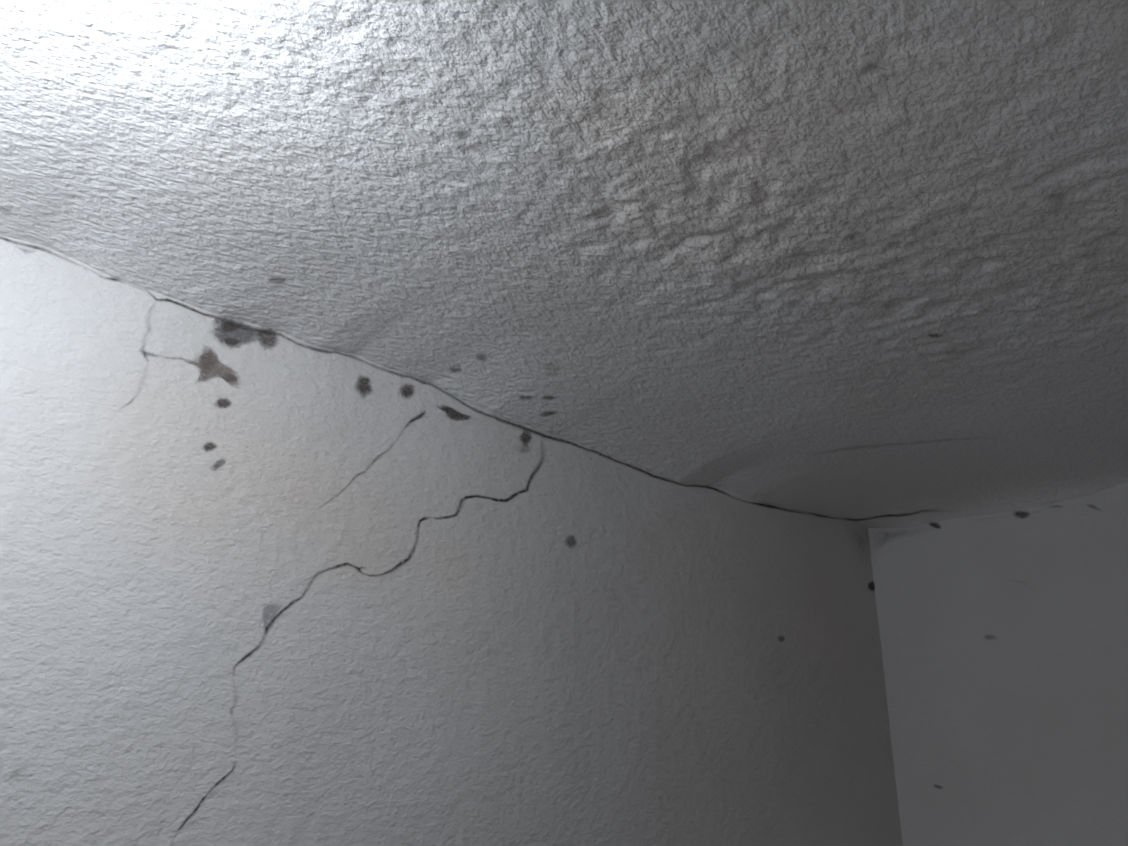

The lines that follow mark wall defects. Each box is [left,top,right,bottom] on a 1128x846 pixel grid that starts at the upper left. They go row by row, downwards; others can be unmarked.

crack [154,297,352,357]
crack [395,373,724,493]
crack [335,466,539,576]
crack [753,503,922,521]
crack [238,598,299,664]
crack [180,771,232,828]